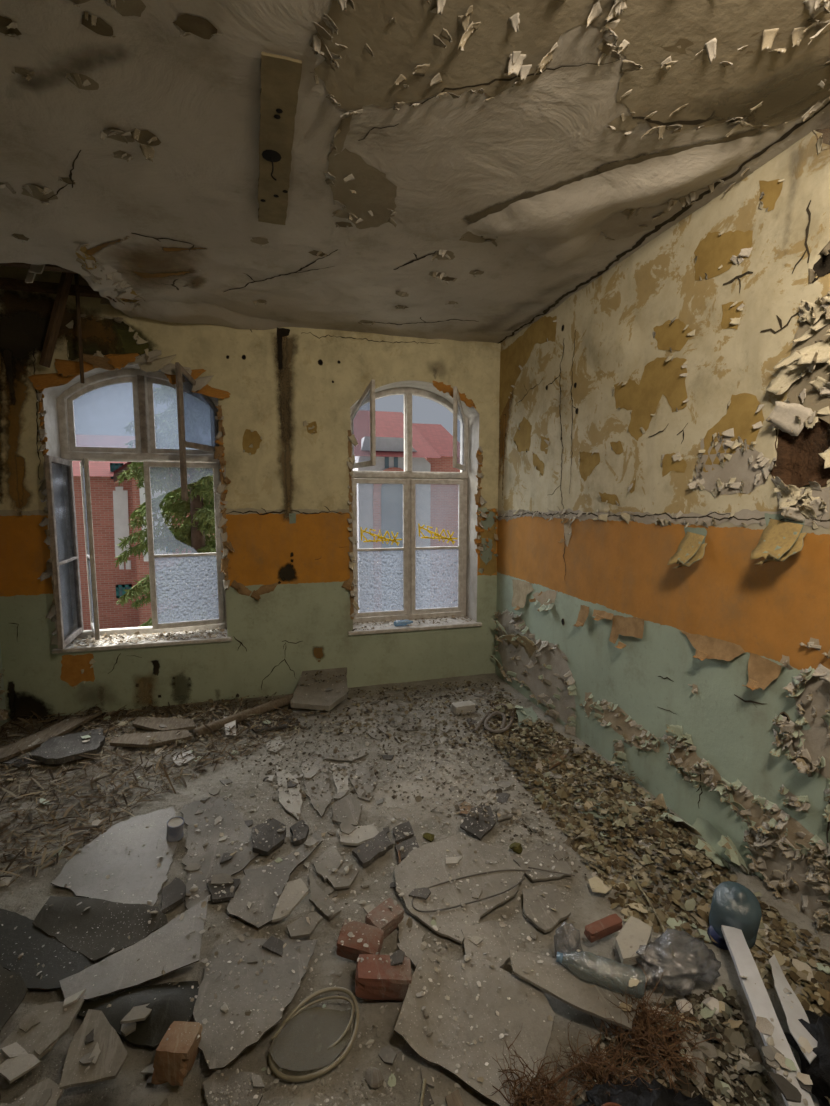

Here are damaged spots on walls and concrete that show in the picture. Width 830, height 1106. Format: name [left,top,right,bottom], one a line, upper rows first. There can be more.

peeling [70,0,116,38]
peeling [172,14,223,39]
crack [358,59,621,141]
peeling [310,0,830,229]
crack [499,101,830,343]
crack [224,250,337,292]
crack [393,251,439,270]
peeling [694,230,753,281]
spalling [809,241,830,284]
crack [303,317,479,344]
crack [498,330,830,580]
peeling [490,579,830,936]